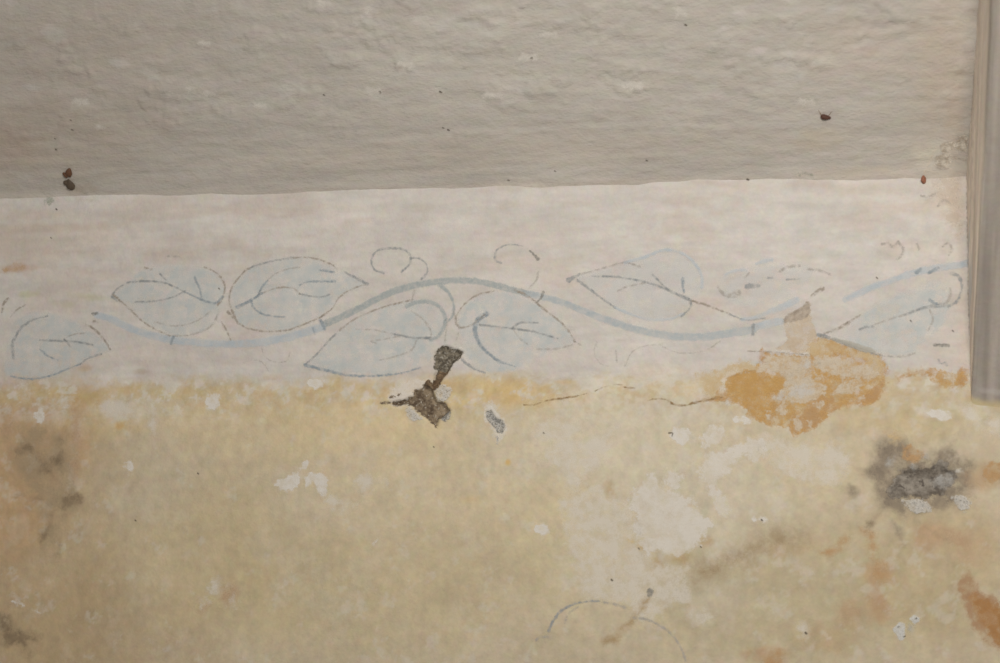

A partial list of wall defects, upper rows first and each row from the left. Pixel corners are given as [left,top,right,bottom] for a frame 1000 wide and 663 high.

flaking render [380,346,467,428]
flaking render [484,406,507,441]